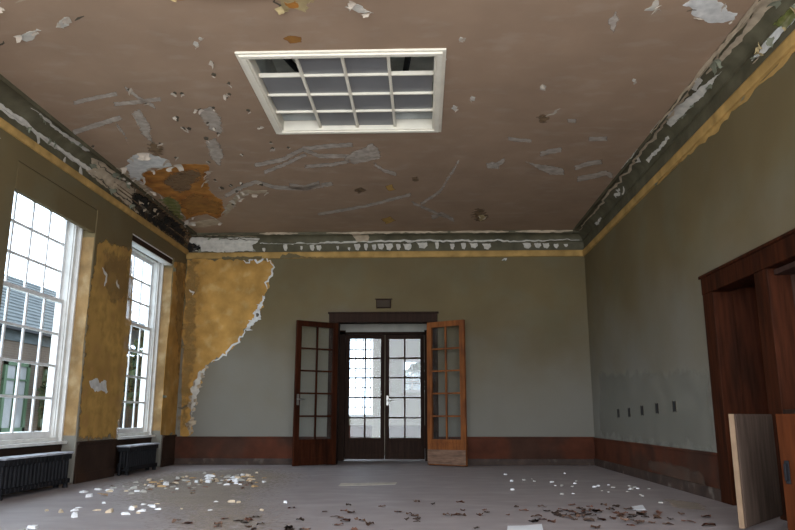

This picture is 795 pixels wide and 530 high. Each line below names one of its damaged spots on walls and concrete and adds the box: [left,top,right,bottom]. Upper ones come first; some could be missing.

peeling [13,29,41,43]
peeling [0,87,179,213]
peeling [177,0,795,436]